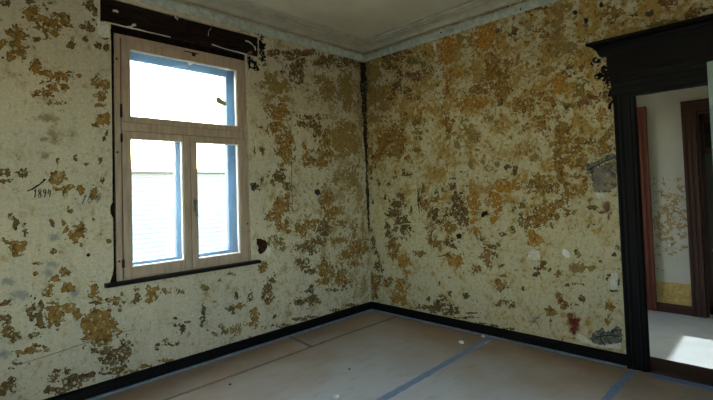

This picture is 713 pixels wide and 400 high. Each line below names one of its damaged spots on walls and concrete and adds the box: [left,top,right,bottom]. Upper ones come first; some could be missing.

peeling [0,0,117,282]
crack [360,62,370,232]
peeling [199,1,617,338]
peeling [652,176,688,271]
peeling [0,265,191,396]
spalling [588,274,624,347]